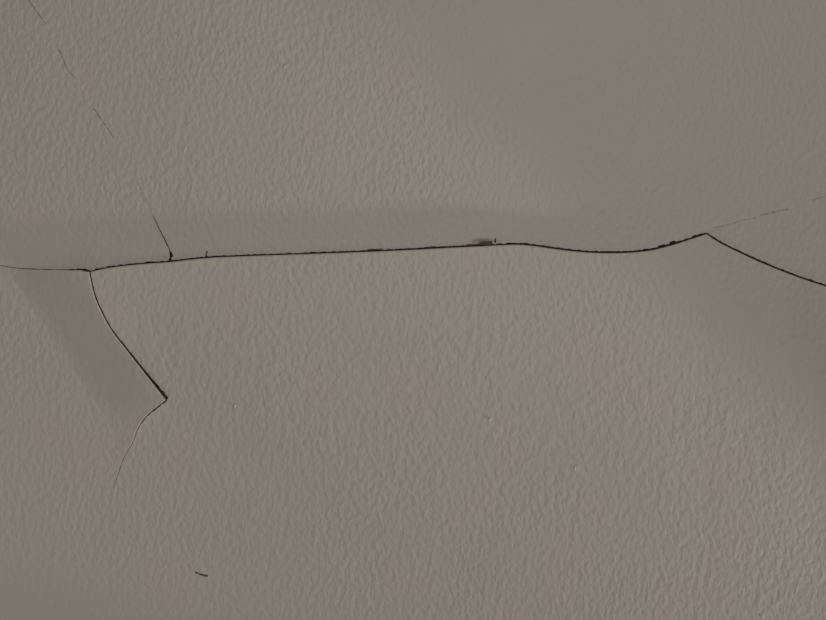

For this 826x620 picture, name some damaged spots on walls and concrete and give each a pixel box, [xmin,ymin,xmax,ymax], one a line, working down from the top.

crack [0,180,826,489]